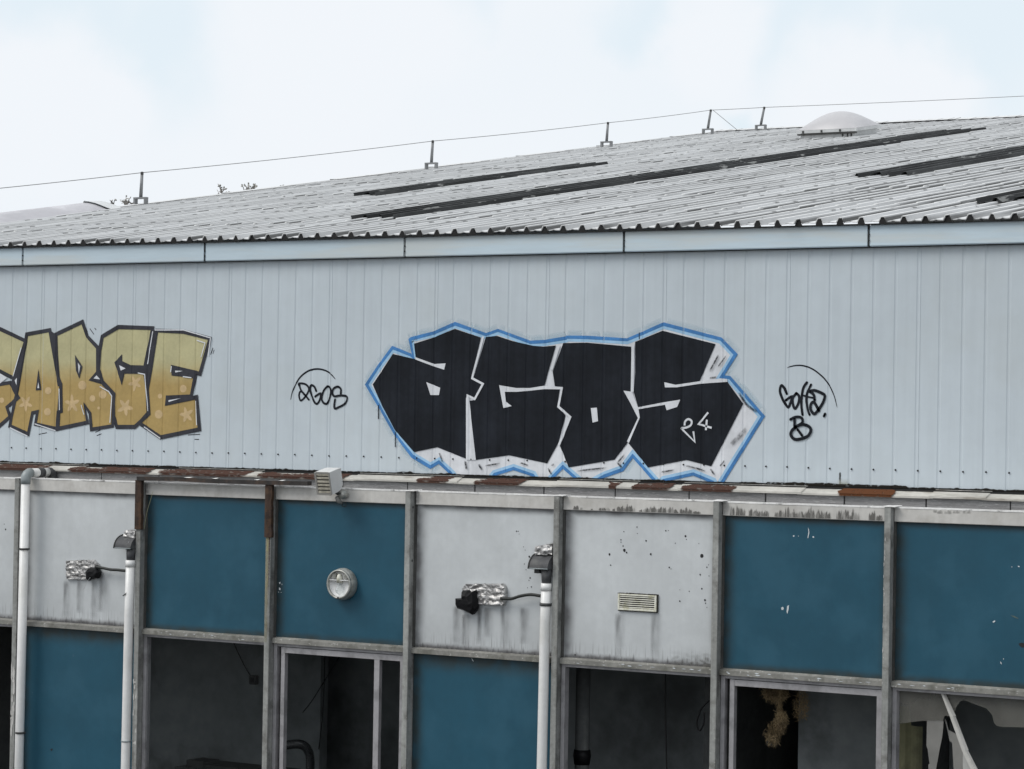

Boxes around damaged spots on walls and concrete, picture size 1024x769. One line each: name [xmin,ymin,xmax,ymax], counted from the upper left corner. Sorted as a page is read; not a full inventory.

rust [0,461,319,480]
rust [341,471,1024,497]
leakage [591,506,699,514]